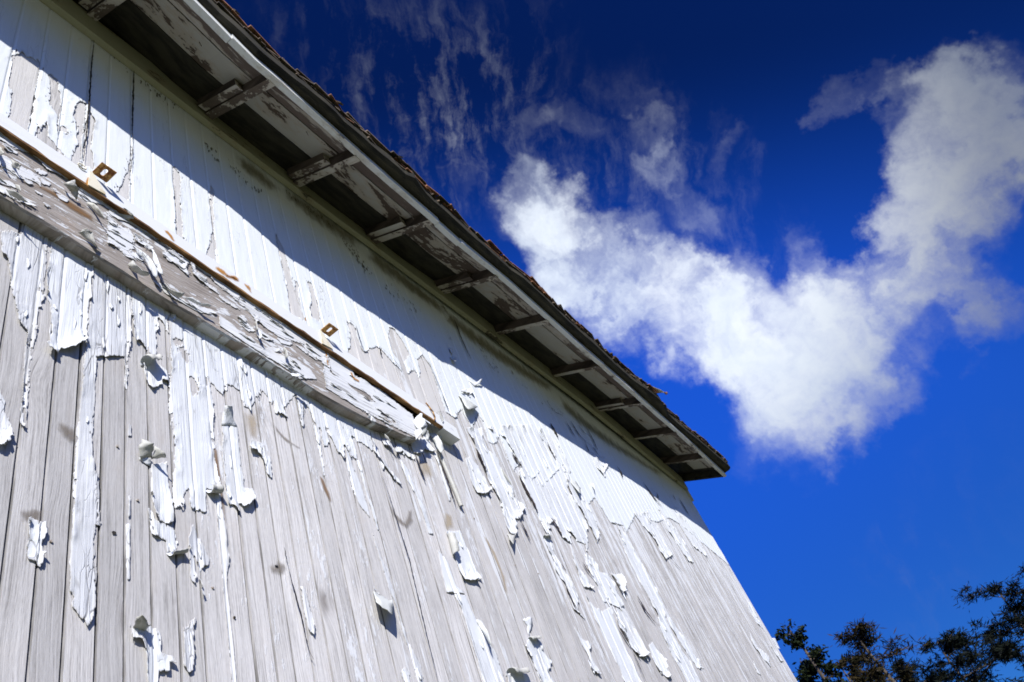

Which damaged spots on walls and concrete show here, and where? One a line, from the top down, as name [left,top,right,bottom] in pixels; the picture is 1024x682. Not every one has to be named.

peeling [9,52,42,140]
peeling [56,102,94,169]
peeling [0,132,463,682]
peeling [458,379,482,409]
peeling [438,530,554,682]
peeling [465,424,707,682]